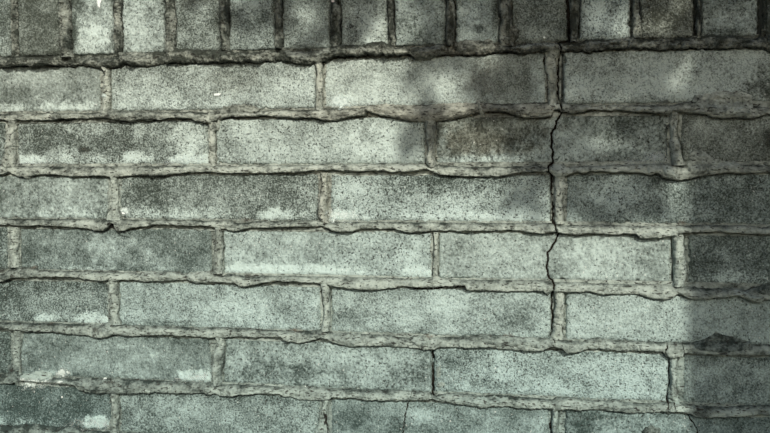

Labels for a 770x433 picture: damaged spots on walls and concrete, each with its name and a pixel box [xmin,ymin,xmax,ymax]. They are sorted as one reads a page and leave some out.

crack [543,0,570,343]
crack [402,351,435,433]
crack [665,344,698,433]